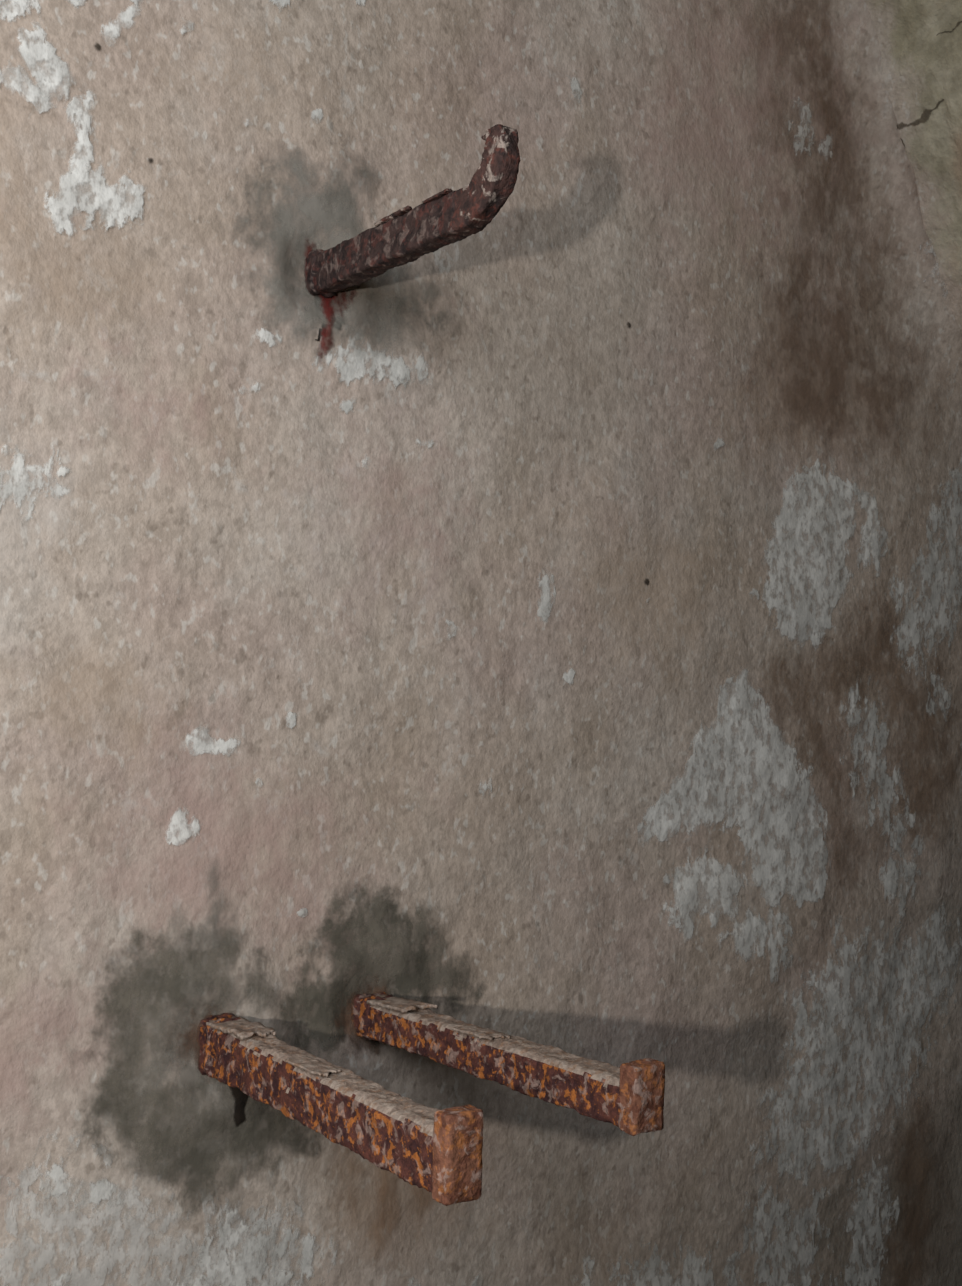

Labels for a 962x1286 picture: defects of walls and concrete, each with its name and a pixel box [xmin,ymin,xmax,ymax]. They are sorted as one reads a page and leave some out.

peeling [0,0,144,235]
crack [897,99,944,147]
corrosion [375,188,453,227]
damp [267,160,405,344]
corrosion [319,290,354,355]
damp [95,889,482,1203]
corrosion [335,986,438,1054]